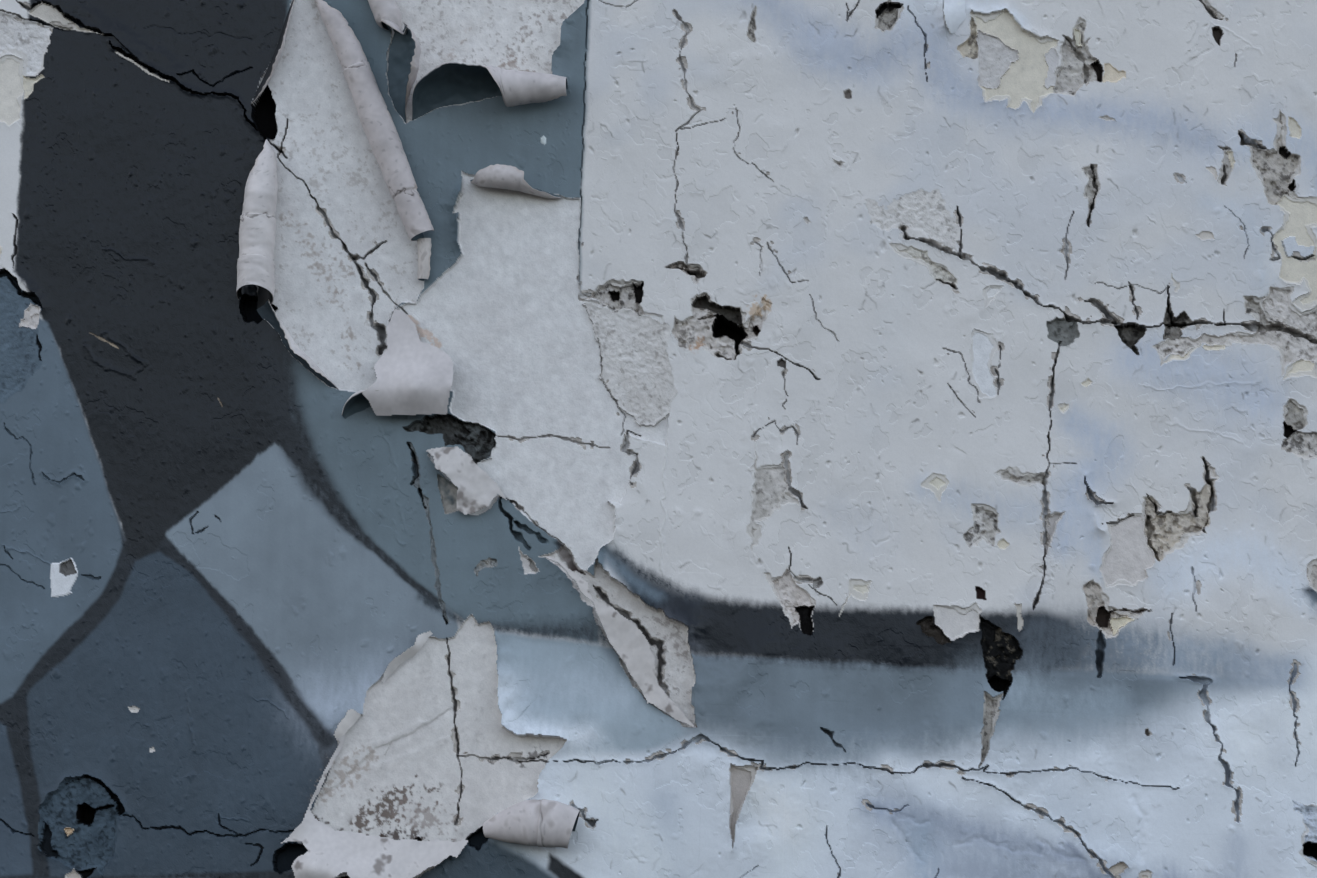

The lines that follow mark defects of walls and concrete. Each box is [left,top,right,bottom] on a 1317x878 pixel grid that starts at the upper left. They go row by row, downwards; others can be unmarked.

spalling [0,11,53,127]
crack [2,0,408,357]
crack [577,0,639,301]
crack [673,10,773,268]
peeling [943,0,1127,114]
spalling [1114,110,1317,381]
peeling [236,0,821,878]
spalling [764,548,872,635]
crack [899,207,1317,610]
spalling [1083,457,1220,678]
crack [445,639,1180,878]
spalling [1293,800,1317,868]